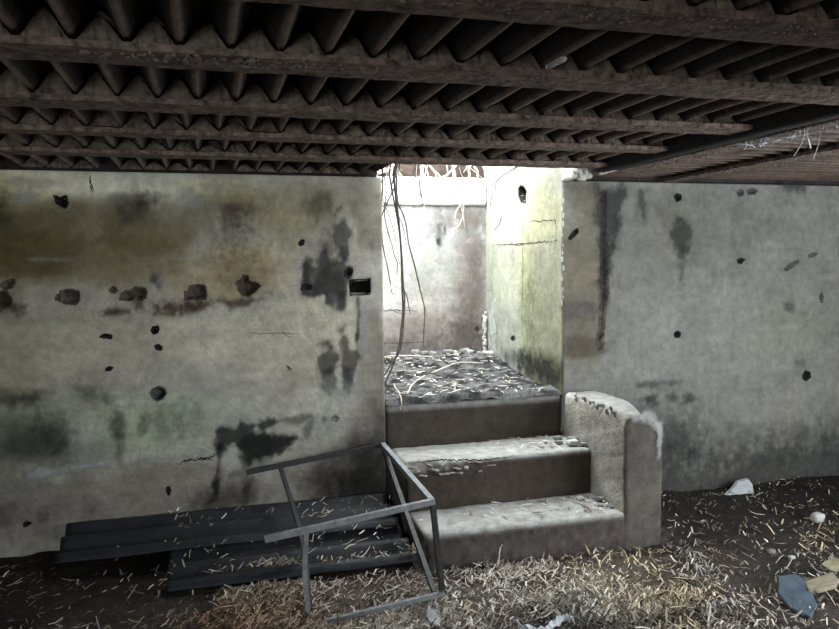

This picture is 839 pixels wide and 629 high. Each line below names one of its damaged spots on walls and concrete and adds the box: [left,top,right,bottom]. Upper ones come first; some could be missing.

damp [597,189,626,274]
damp [303,221,353,310]
spalling [0,278,16,309]
spalling [55,289,80,305]
spalling [108,286,147,301]
spalling [184,284,207,301]
spalling [235,274,261,298]
damp [318,322,359,387]
spalling [574,394,618,417]
damp [216,419,297,465]
spalling [406,461,496,477]